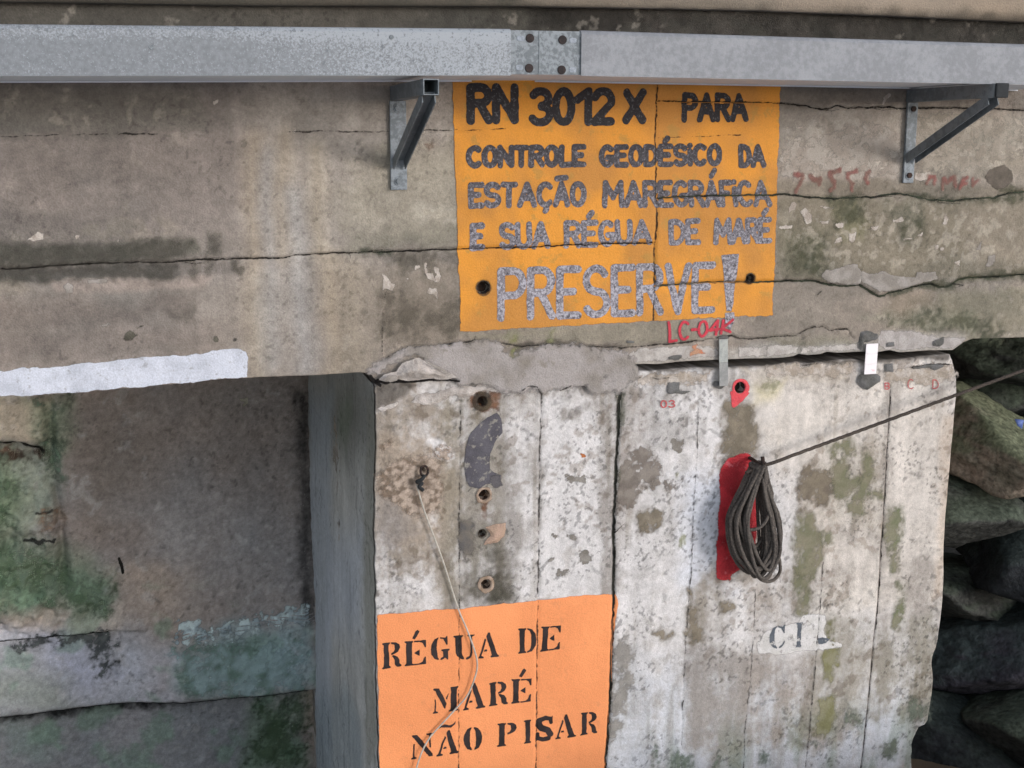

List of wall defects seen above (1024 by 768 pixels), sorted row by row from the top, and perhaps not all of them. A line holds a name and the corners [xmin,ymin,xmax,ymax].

crack [1,87,1024,387]
spalling [822,264,938,292]
spalling [378,358,498,412]
leakage [797,438,883,515]
leakage [793,576,811,615]
leakage [891,582,905,629]
leakage [812,695,861,748]